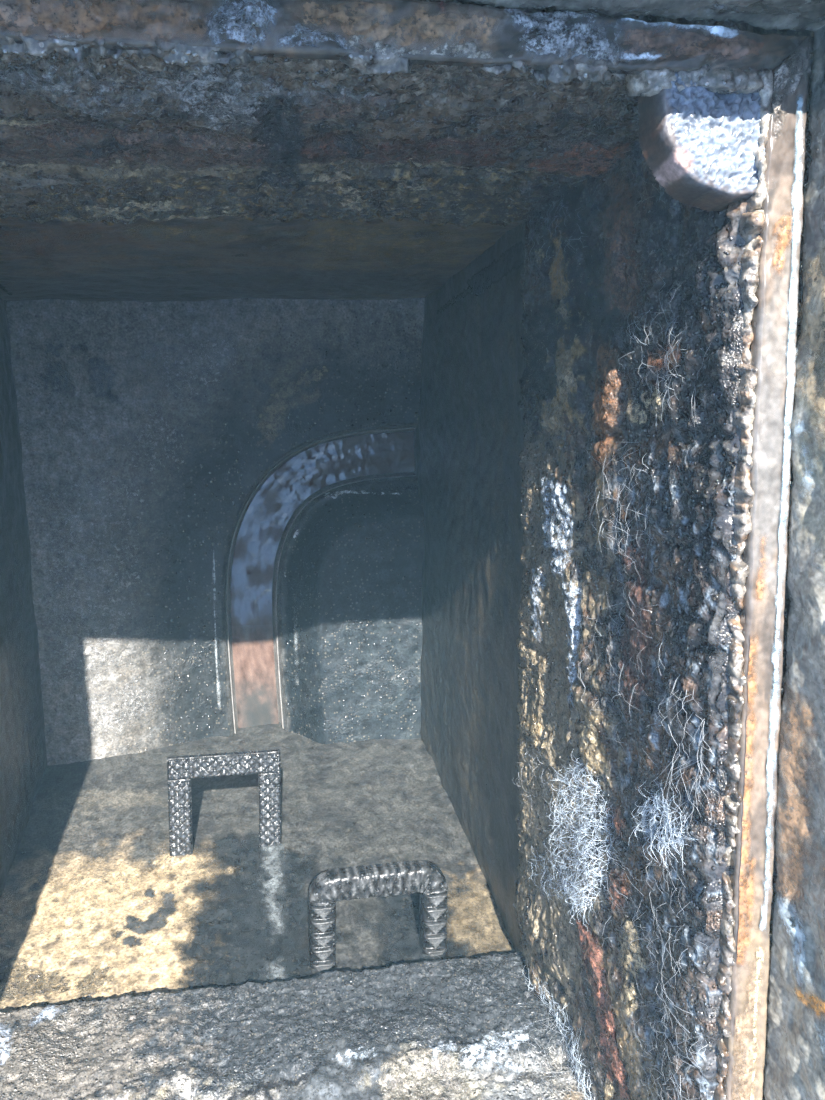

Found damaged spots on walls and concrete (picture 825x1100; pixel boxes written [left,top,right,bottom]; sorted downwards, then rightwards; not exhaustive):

corrosion [773,215,794,272]
damp [530,476,582,707]
damp [0,1027,11,1064]
damp [0,833,315,1024]
damp [366,880,515,968]
corrosion [732,638,761,1100]
corrosion [776,691,814,901]
corrosion [795,990,825,1016]